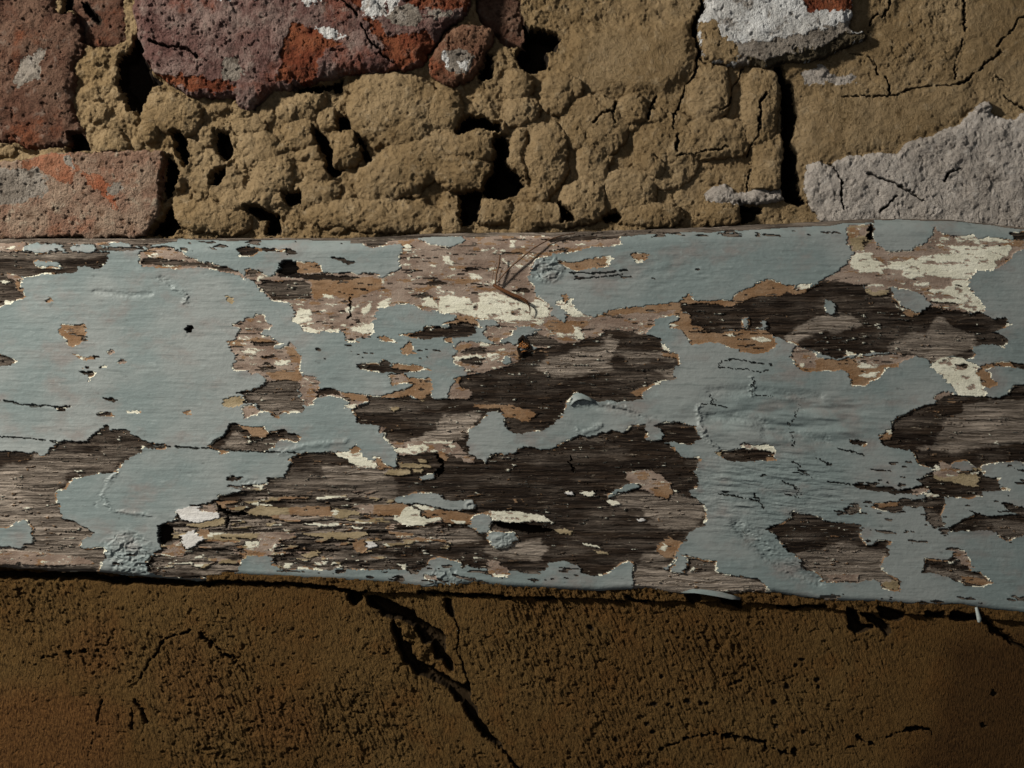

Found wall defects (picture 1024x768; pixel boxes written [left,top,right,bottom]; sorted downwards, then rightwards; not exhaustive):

crack [647,0,768,191]
crack [856,0,907,98]
crack [932,0,1024,110]
crack [828,164,844,209]
crack [866,175,925,240]
peeling [0,223,1024,636]
crack [625,595,648,603]
crack [776,602,827,610]
crack [0,570,557,768]